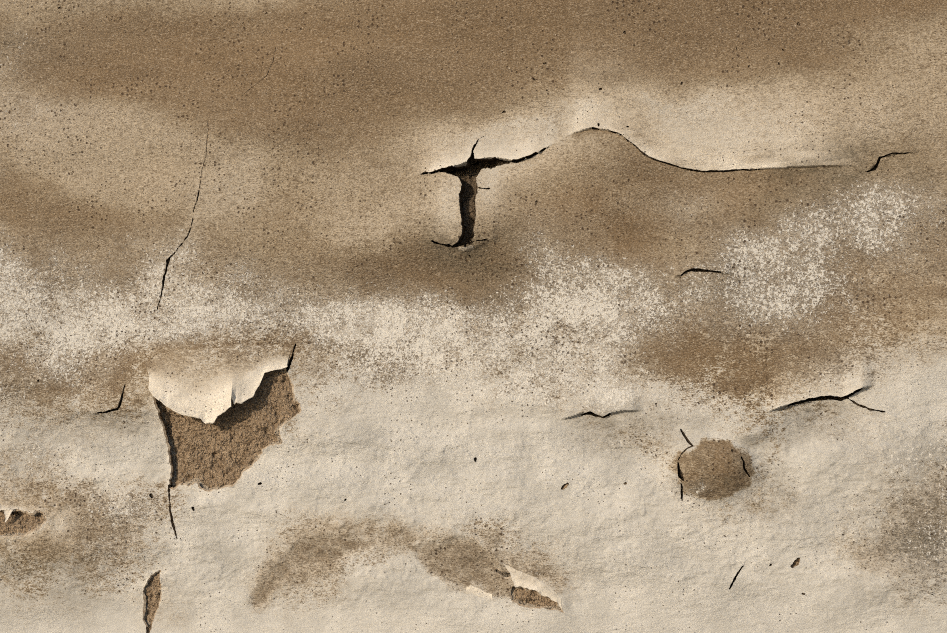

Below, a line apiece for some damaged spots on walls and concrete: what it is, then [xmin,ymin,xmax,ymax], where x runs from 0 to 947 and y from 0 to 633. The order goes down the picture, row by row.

crack [157,121,209,310]
leakage [0,0,947,427]
crack [867,152,909,172]
peeling [0,184,922,539]
crack [787,388,886,413]
spalling [143,570,169,633]
peeling [249,515,564,613]
leakage [846,460,947,596]